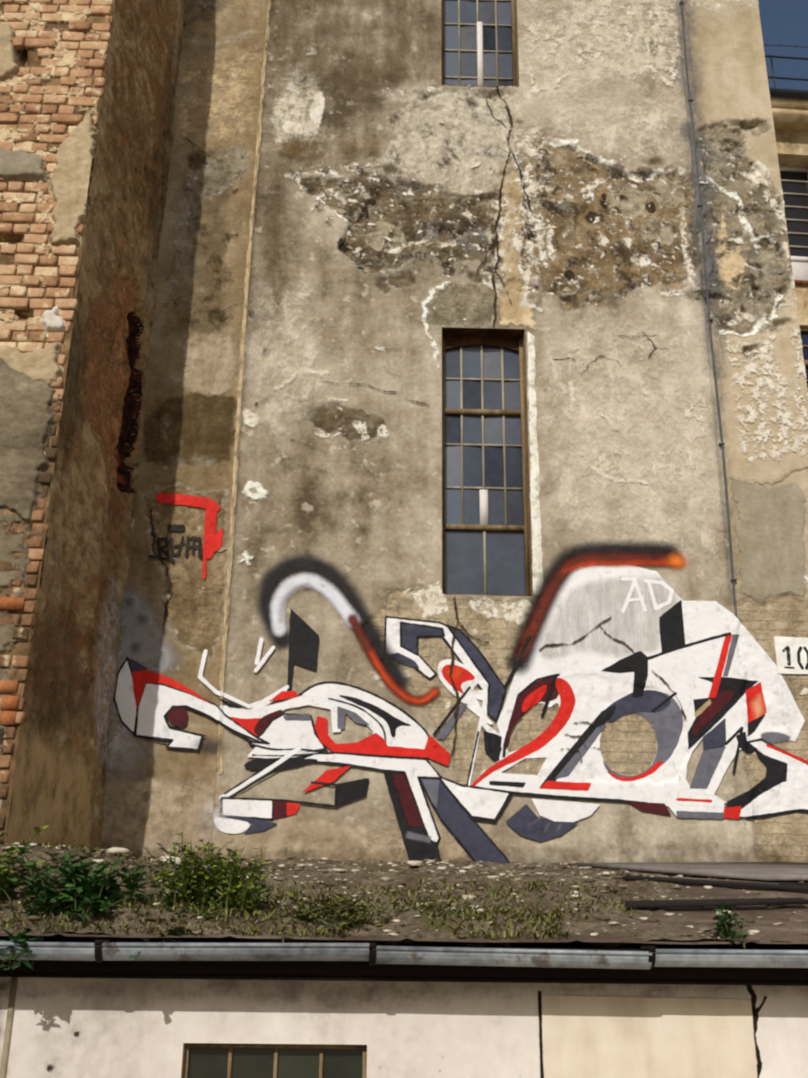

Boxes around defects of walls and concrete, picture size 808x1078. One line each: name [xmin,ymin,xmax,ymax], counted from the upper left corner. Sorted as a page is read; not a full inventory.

damp [385,0,520,185]
crack [477,86,532,326]
damp [252,291,327,440]
flaking render [115,0,808,705]
flaking render [396,637,492,785]
flaking render [509,703,559,775]
flaking render [600,713,657,776]
crack [747,985,767,1078]